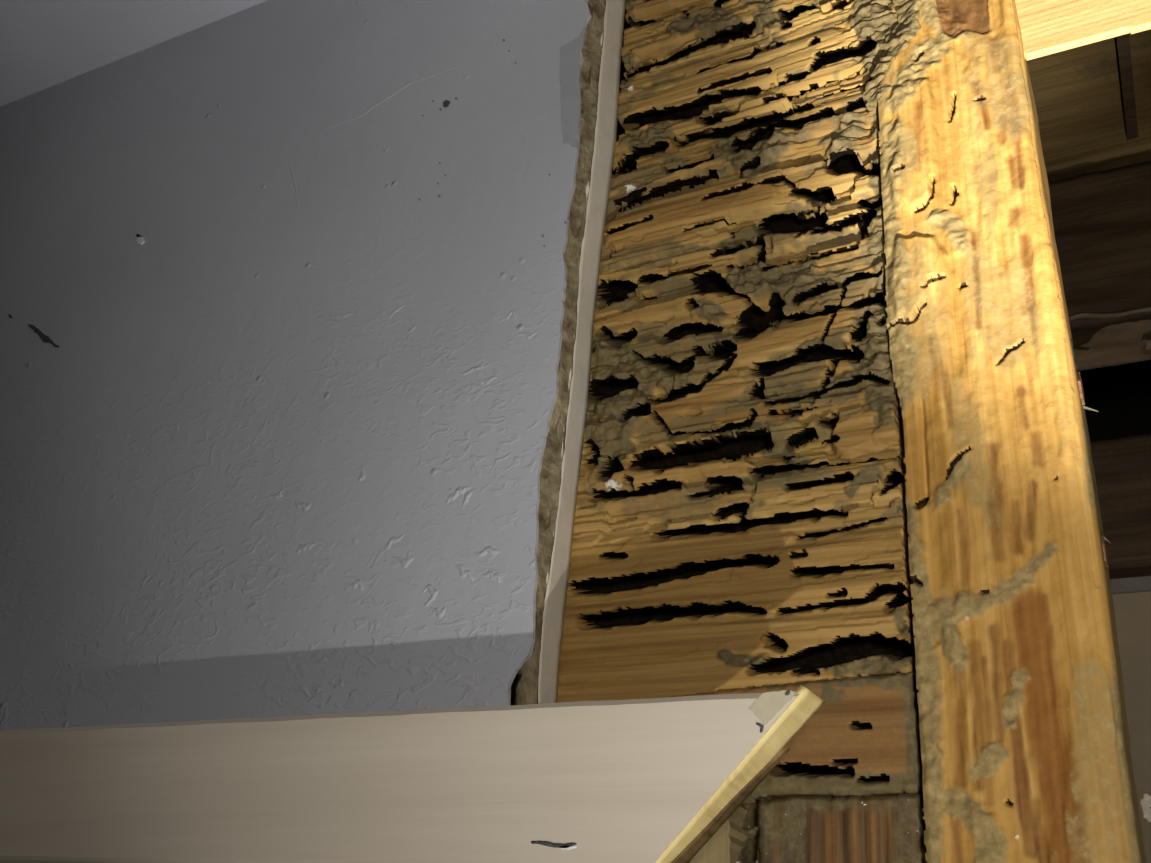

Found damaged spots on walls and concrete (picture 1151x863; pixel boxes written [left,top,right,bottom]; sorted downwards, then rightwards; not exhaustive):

peeling [667,8,745,38]
peeling [559,28,586,148]
peeling [612,121,678,178]
spalling [731,123,787,153]
peeling [825,112,881,176]
spalling [758,186,883,266]
spalling [597,264,795,339]
spalling [820,286,847,341]
spalling [850,310,886,342]
peeling [648,364,694,395]
spalling [597,454,634,482]
peeling [762,426,904,500]